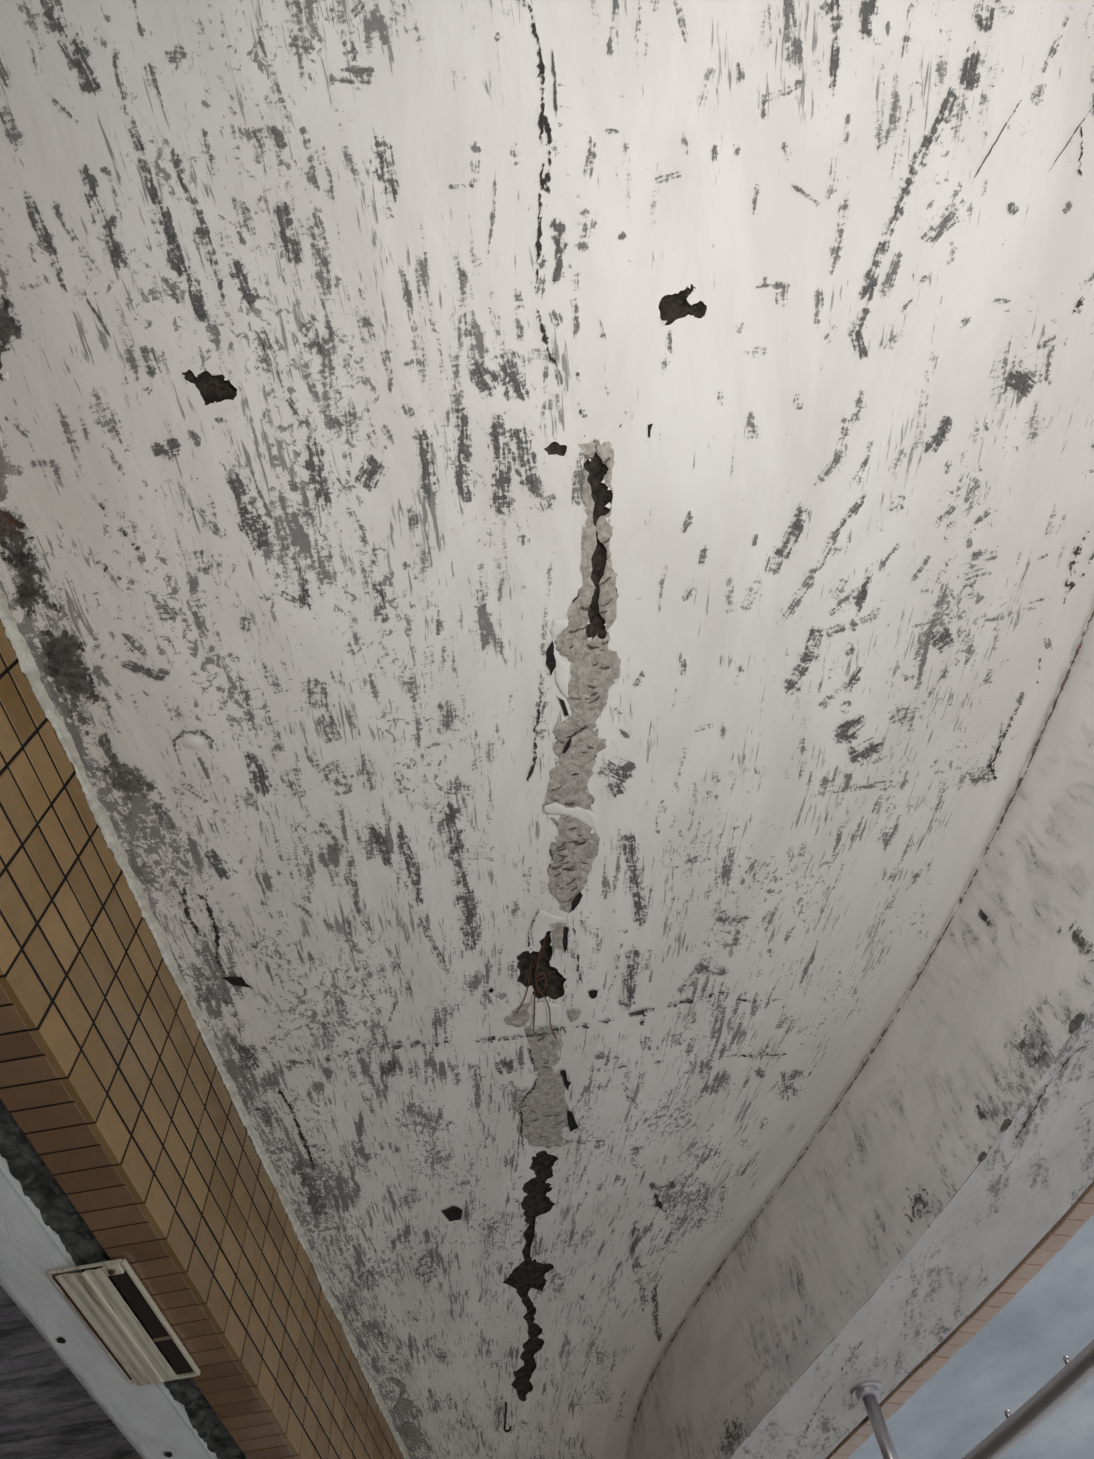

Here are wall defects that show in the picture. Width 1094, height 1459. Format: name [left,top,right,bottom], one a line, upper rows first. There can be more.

peeling [0,295,35,382]
spalling [658,284,707,326]
spalling [181,369,237,405]
peeling [0,435,160,801]
crack [527,689,565,781]
spalling [516,931,567,1000]
crack [625,531,1094,1459]
crack [250,991,782,1170]